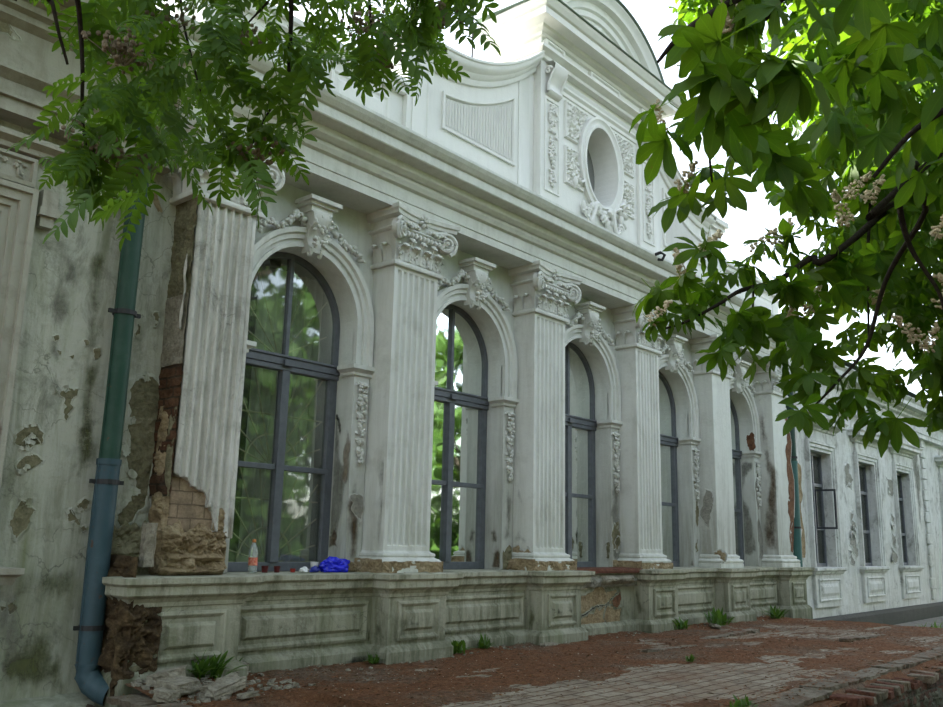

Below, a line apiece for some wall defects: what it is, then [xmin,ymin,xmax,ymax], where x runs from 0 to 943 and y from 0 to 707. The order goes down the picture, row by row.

peeling [54,384,79,422]
peeling [7,494,37,543]
peeling [13,422,46,476]
spalling [107,363,227,578]
peeling [692,477,715,555]
peeling [745,431,763,561]
spalling [713,549,727,563]
flaking render [581,587,622,625]
spalling [98,589,162,697]